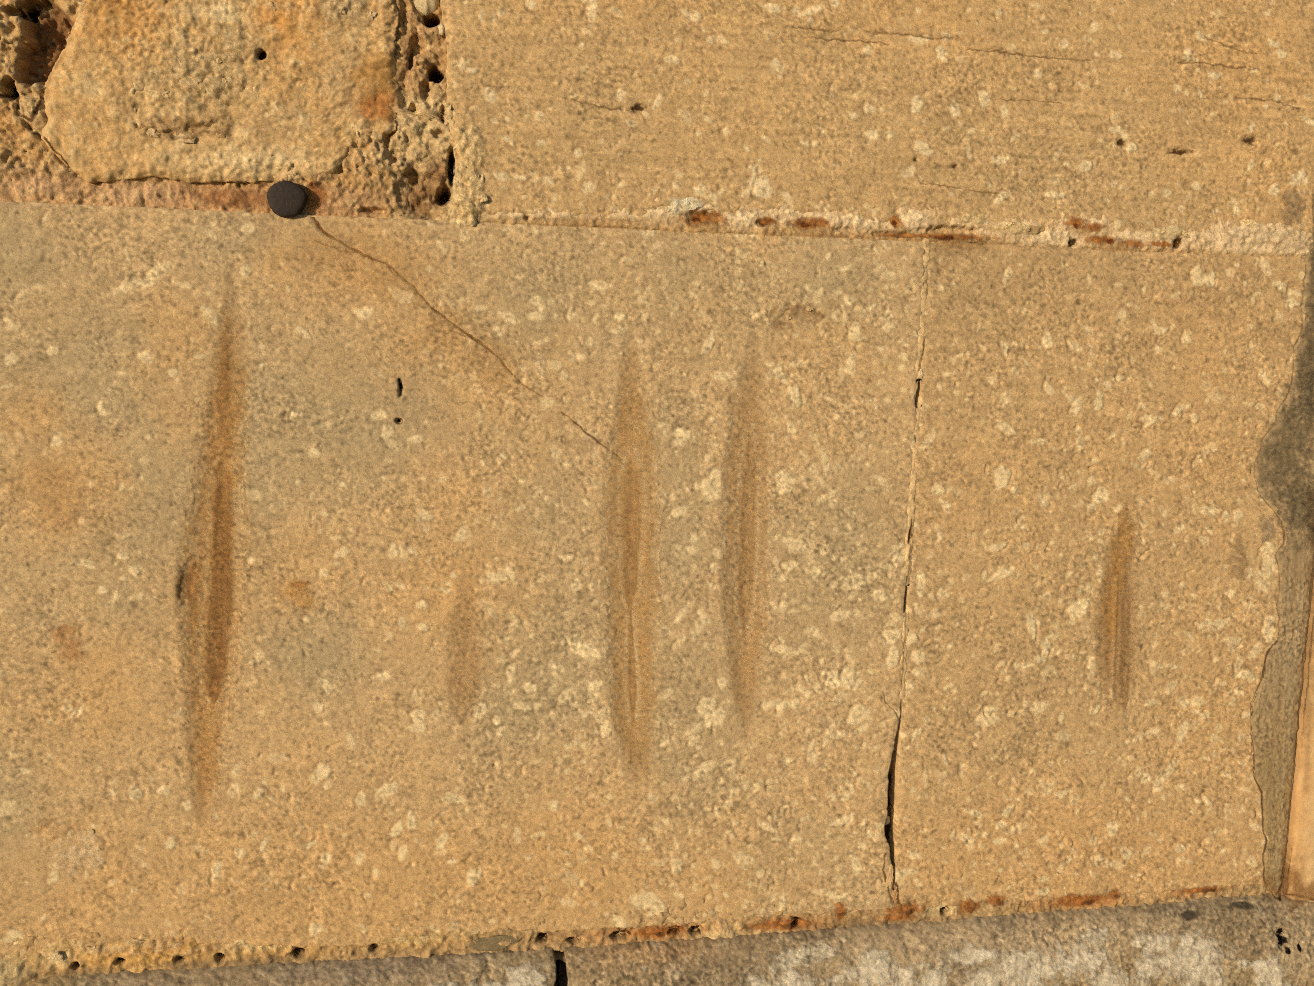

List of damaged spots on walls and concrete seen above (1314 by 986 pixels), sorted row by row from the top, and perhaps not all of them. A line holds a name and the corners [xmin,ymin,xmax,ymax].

corrosion [682,210,726,226]
corrosion [758,217,827,230]
corrosion [882,216,990,240]
corrosion [1065,217,1172,247]
crack [312,215,527,388]
crack [916,338,925,406]
water stain [1260,250,1314,541]
crack [562,413,649,483]
crack [882,772,900,904]
corrosion [959,895,1004,913]
corrosion [1056,889,1120,907]
crack [553,959,561,986]